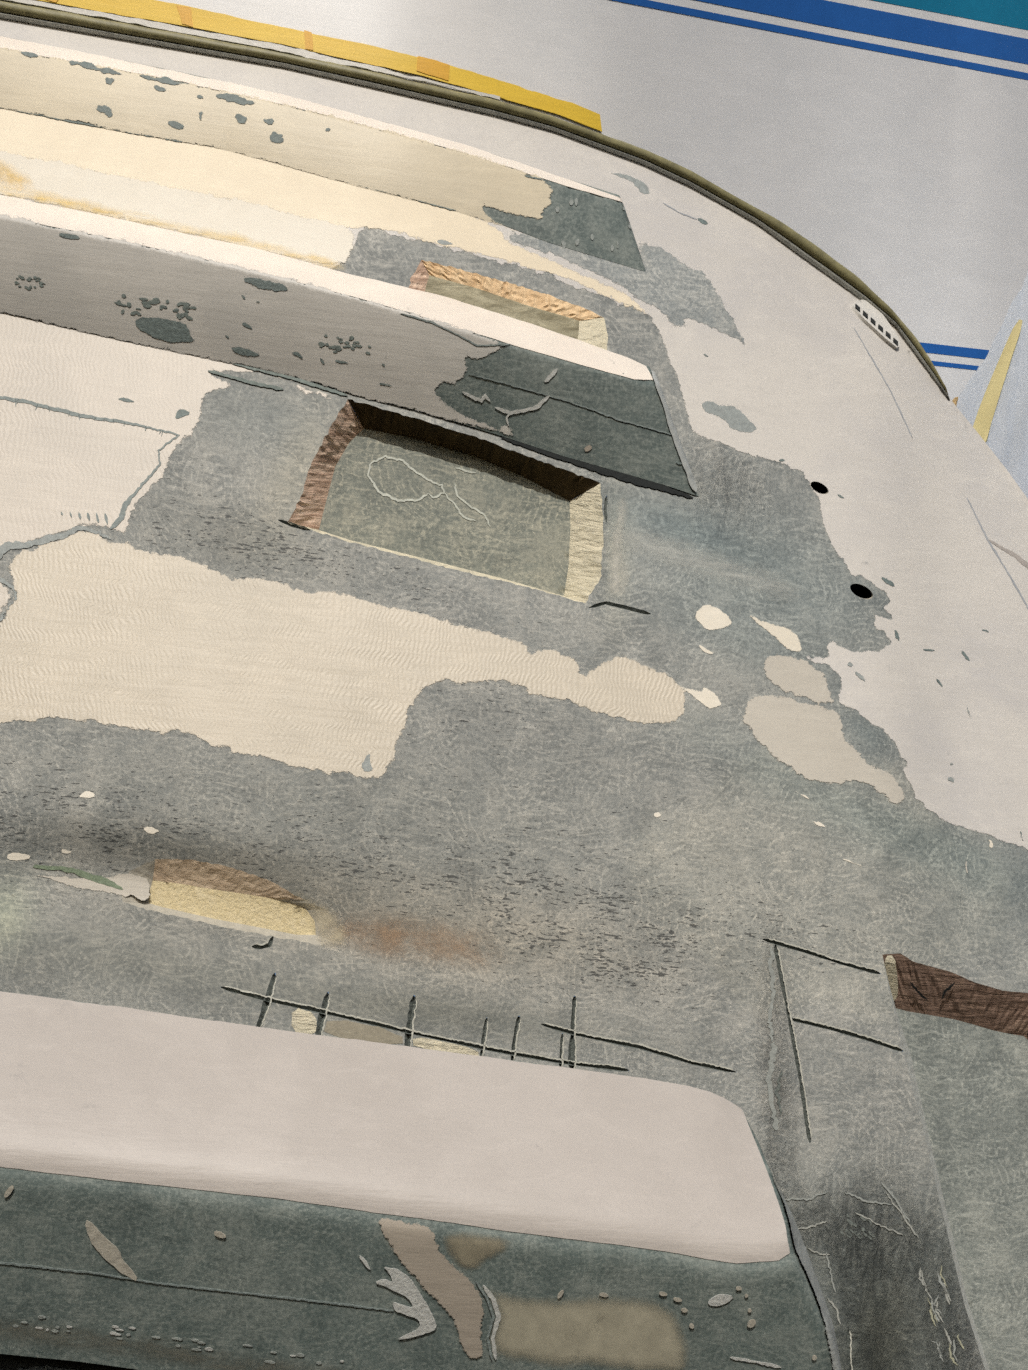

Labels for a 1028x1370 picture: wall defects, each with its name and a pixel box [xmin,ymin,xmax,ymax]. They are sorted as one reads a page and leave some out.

peeling [69,60,121,85]
peeling [139,75,178,91]
peeling [96,105,113,117]
peeling [168,93,283,143]
peeling [15,275,45,290]
peeling [242,276,288,302]
peeling [115,294,196,343]
peeling [225,335,259,356]
peeling [318,334,391,386]
peeling [362,754,373,772]
peeling [659,1292,694,1329]